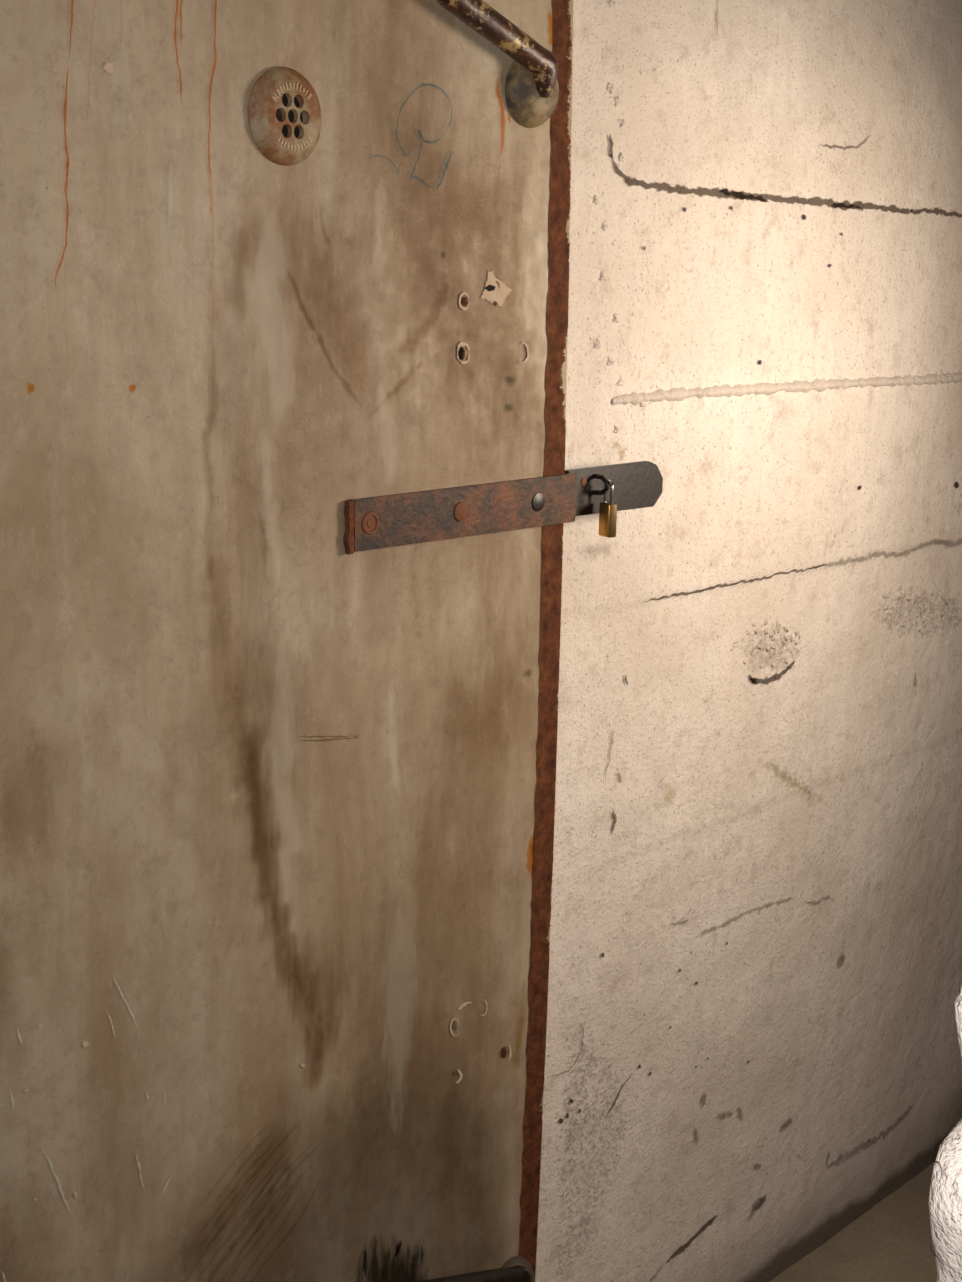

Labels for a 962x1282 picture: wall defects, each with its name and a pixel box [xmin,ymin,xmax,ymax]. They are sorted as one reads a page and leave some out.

rust [544,0,573,476]
crack [609,134,962,218]
crack [647,564,827,602]
rust [518,523,563,1275]